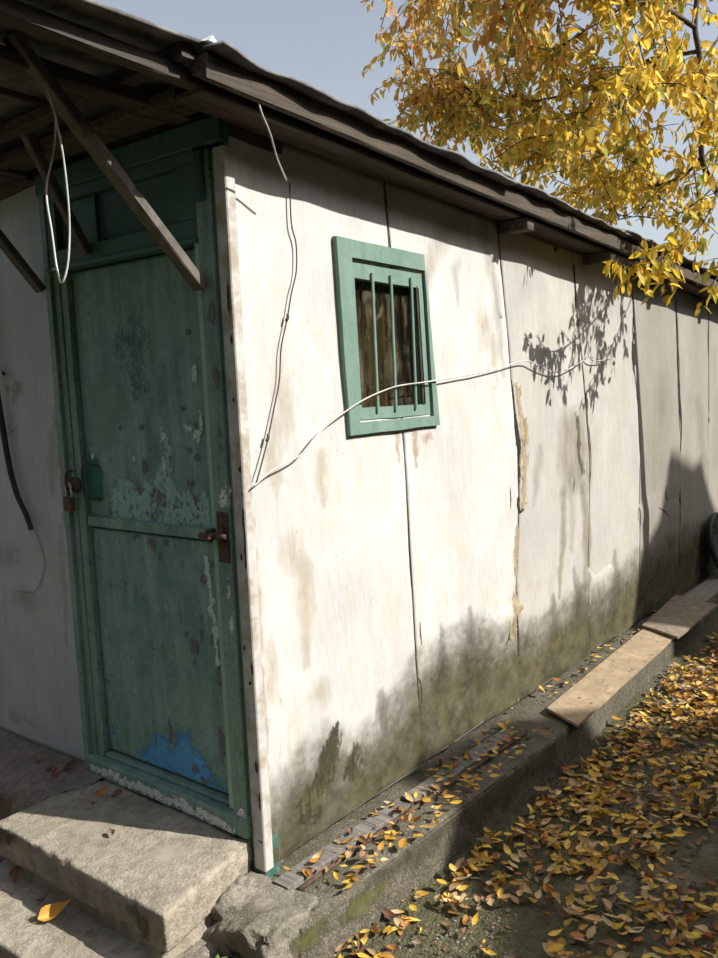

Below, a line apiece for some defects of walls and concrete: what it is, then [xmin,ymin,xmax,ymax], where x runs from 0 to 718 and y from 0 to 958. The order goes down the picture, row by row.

crack [571,265,579,324]
crack [632,286,640,448]
peeling [105,427,242,528]
crack [510,380,526,513]
crack [573,368,591,492]
peeling [184,556,234,691]
peeling [90,763,235,835]
peeling [126,719,226,792]
water stain [271,530,717,883]